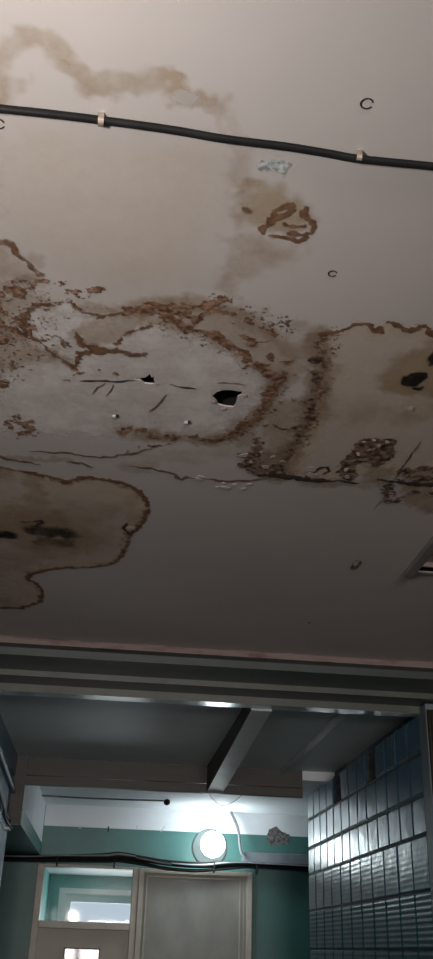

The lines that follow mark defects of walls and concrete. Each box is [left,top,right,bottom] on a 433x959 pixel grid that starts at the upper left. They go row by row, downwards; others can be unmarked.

peeling [0,278,340,480]
leakage [318,321,433,388]
leakage [383,350,433,396]
leakage [286,400,344,480]
peeling [336,438,397,481]
peeling [380,466,433,508]
leakage [0,466,150,609]
spalling [267,827,290,845]